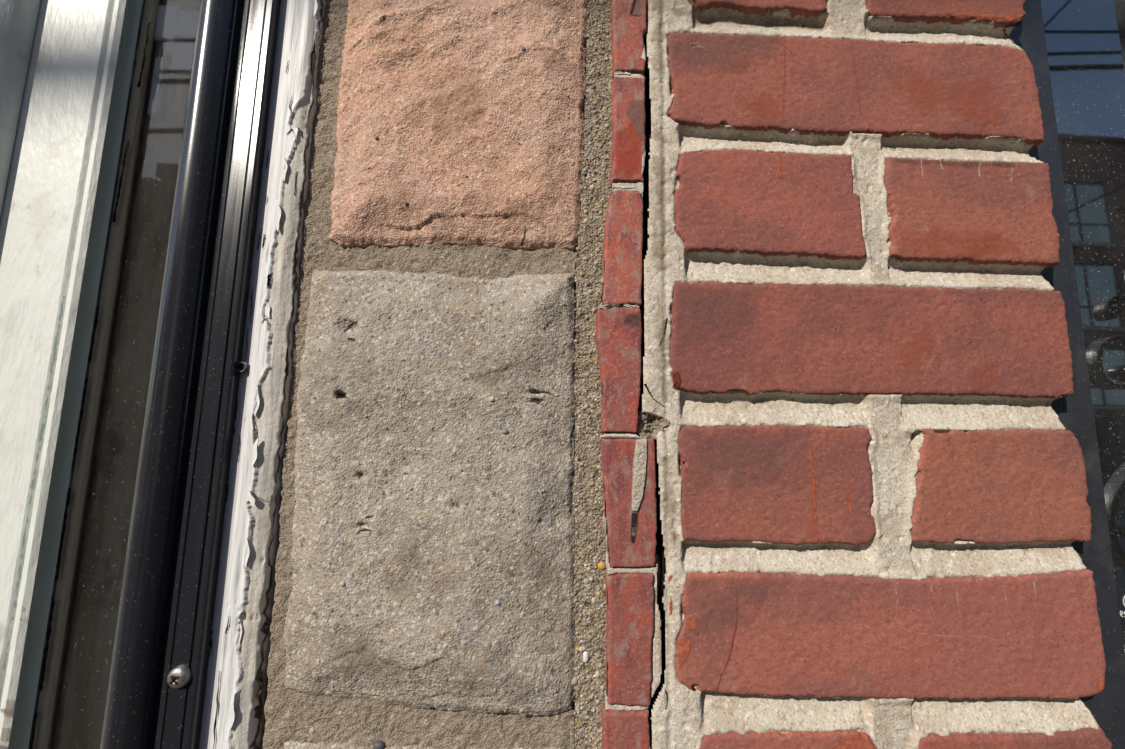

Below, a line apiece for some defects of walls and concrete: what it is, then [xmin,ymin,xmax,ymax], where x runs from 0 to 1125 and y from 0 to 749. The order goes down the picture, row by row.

peeling [229,44,320,749]
crack [637,11,668,735]